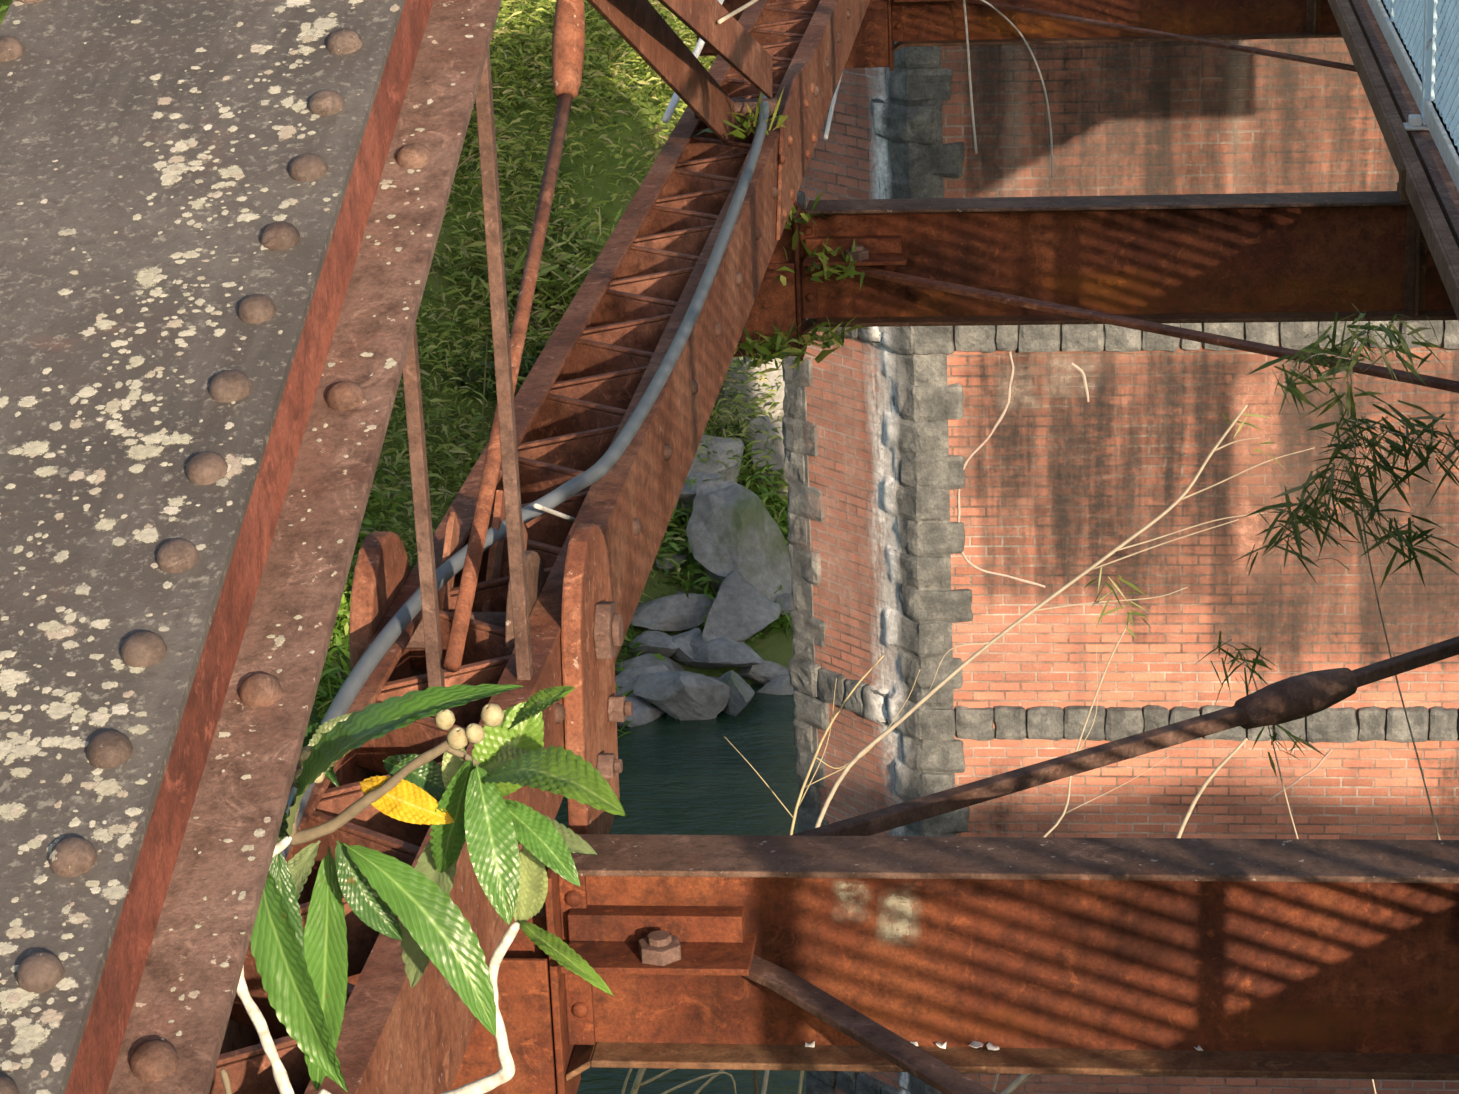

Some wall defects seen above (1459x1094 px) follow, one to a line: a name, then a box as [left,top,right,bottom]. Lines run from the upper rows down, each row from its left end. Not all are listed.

leakage [977,365,1029,485]
leakage [1054,360,1144,621]
leakage [1164,364,1227,520]
leakage [1311,379,1350,531]
corrosion [886,879,1050,898]
corrosion [1109,881,1164,963]